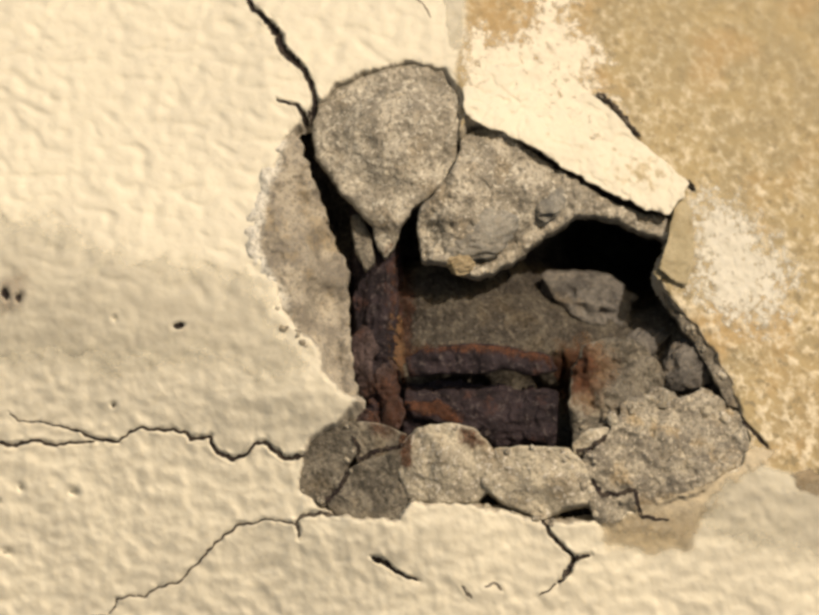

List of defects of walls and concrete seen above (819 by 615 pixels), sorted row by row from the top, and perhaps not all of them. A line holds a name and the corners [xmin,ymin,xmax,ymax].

crack [247,0,318,127]
spalling [244,0,774,540]
corrosion [367,243,608,448]
crack [0,414,305,462]
corrosion [399,434,412,467]
crack [109,436,405,614]
crack [371,556,418,581]
crack [462,582,502,598]
crack [539,520,590,596]